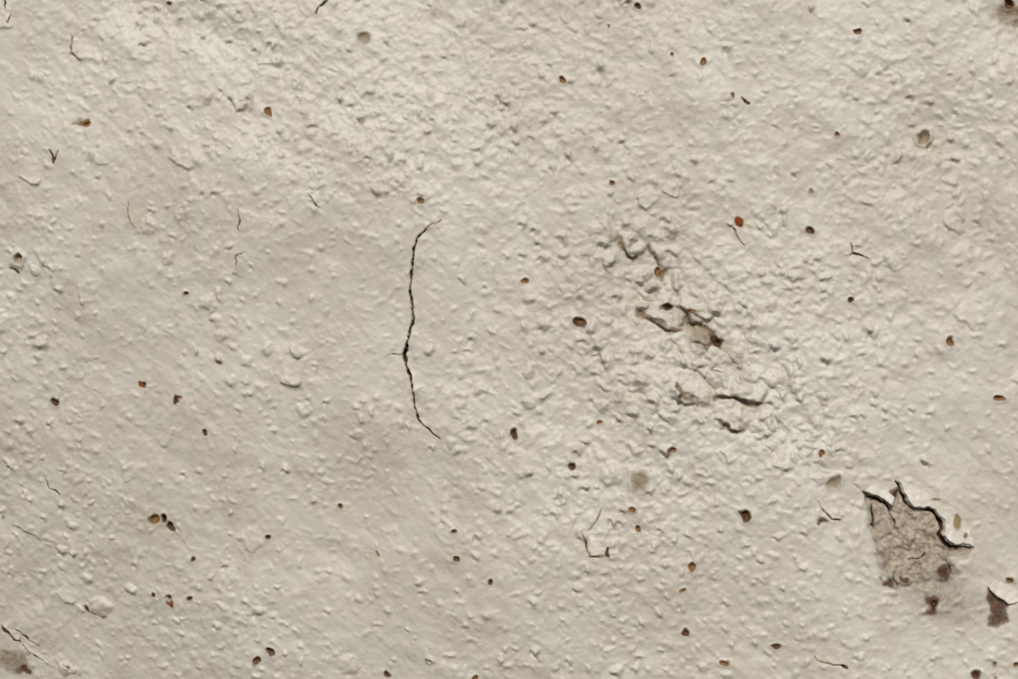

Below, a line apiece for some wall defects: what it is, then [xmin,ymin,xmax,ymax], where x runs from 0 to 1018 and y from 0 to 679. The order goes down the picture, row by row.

crack [392,219,441,437]
peeling [862,480,975,587]
peeling [988,578,1018,626]